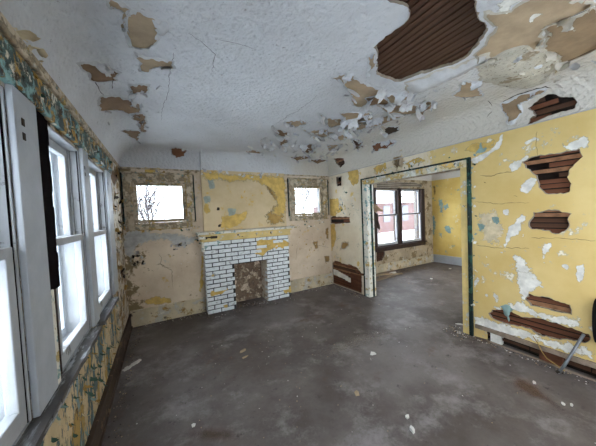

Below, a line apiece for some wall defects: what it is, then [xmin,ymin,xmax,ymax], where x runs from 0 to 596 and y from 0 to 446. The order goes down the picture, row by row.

peeling [13,27,48,65]
peeling [76,61,122,83]
peeling [97,83,162,144]
peeling [106,0,176,73]
flaking render [271,0,596,174]
flaking render [509,136,589,194]
peeling [217,207,248,229]
peeling [195,168,287,225]
flaking render [472,209,572,253]
flaking render [326,261,364,294]
peeling [474,254,596,382]
peeling [74,337,120,404]